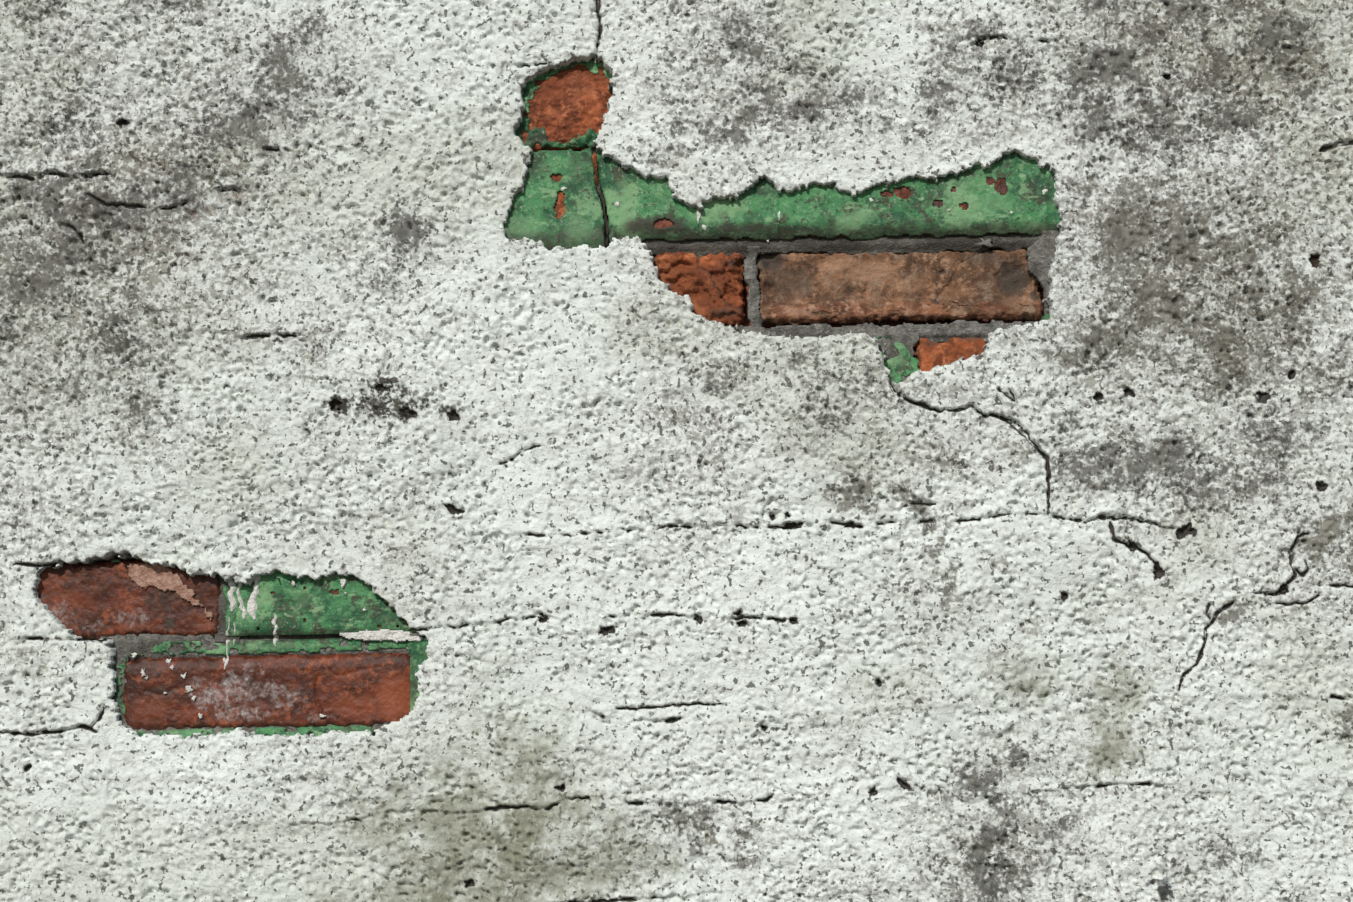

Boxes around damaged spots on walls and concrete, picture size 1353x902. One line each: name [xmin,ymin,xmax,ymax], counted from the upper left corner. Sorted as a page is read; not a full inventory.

crack [595,0,603,62]
spalling [504,58,1061,384]
crack [0,705,104,737]
spalling [37,559,429,739]
crack [1179,532,1353,690]